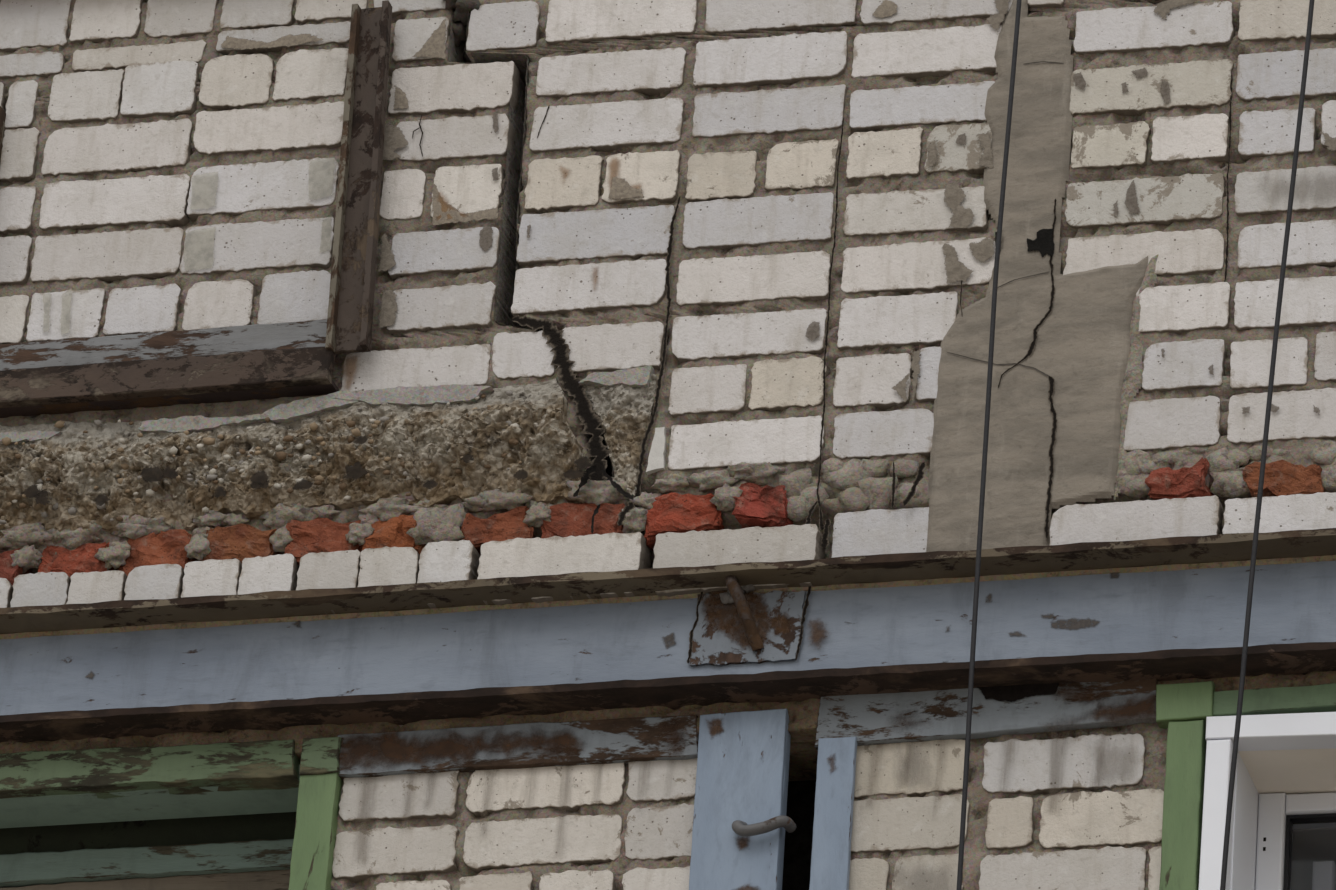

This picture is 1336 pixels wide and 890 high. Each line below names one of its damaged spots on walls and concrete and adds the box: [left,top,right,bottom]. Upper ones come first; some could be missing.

spalling [0,378,591,538]
crack [449,10,680,568]
spalling [579,365,666,496]
crack [947,199,1057,538]